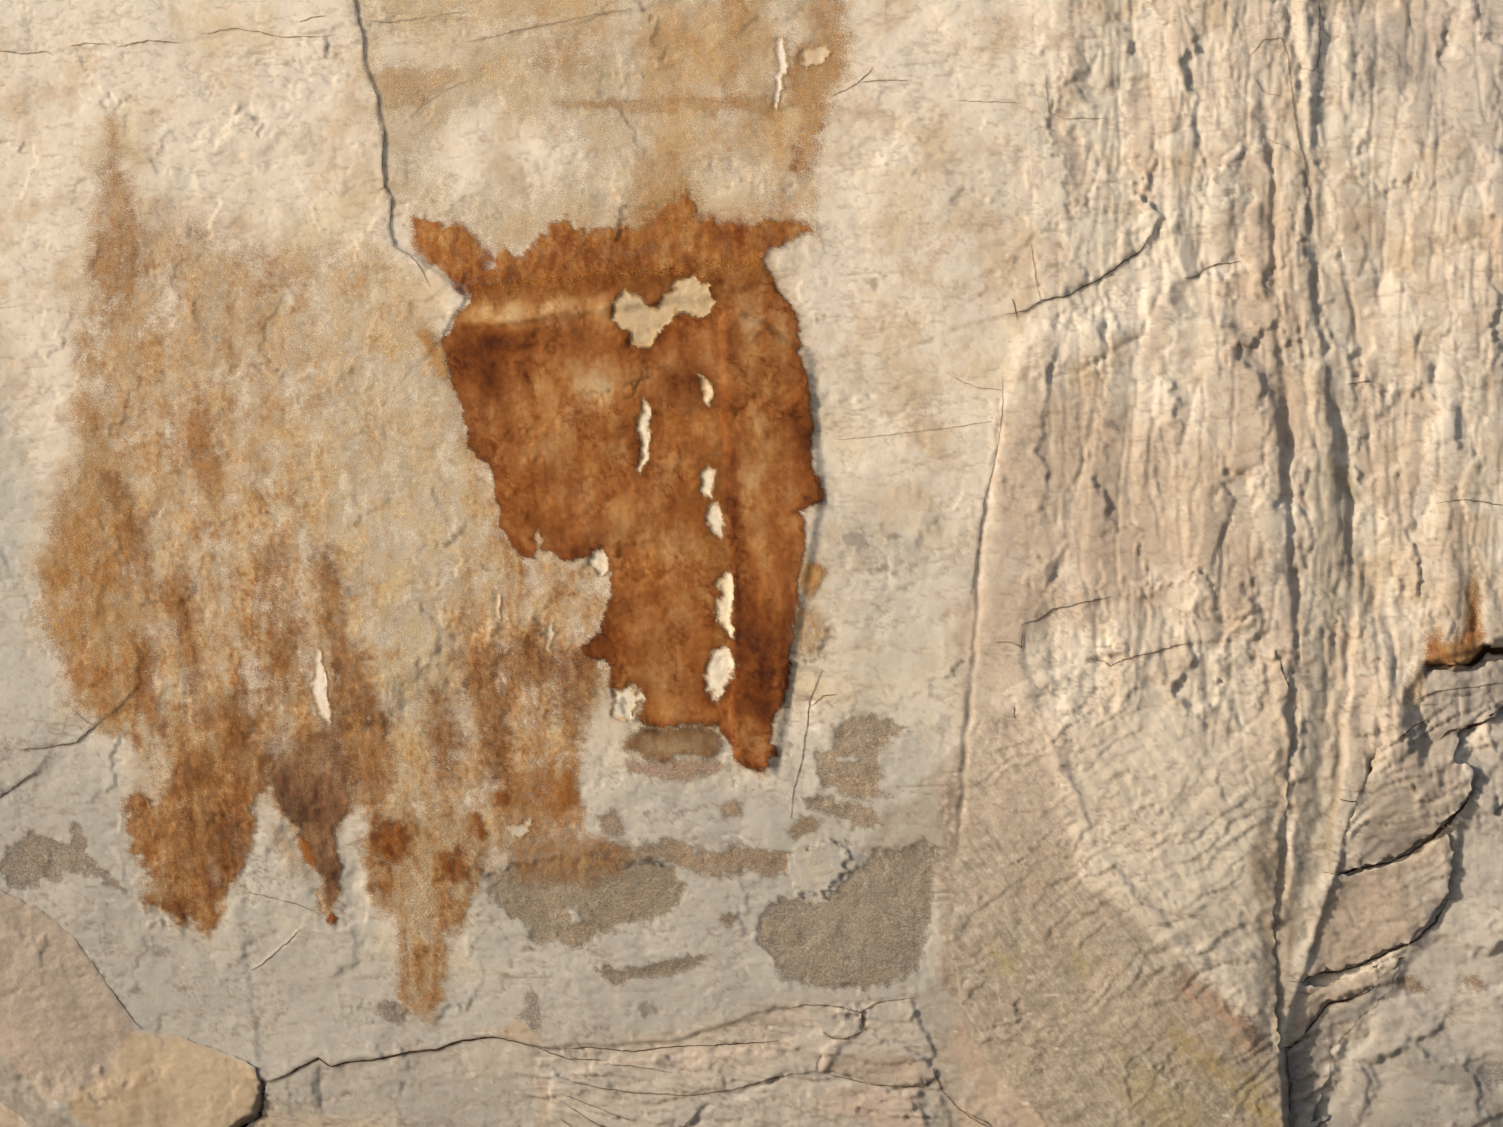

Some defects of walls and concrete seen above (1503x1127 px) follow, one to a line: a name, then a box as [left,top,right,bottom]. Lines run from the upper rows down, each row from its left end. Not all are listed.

corrosion [33,0,854,1019]
corrosion [1407,578,1484,702]
crack [1401,645,1503,739]
spalling [488,713,940,991]
crack [1323,789,1474,875]
crack [1279,900,1448,1050]
crack [242,998,992,1127]